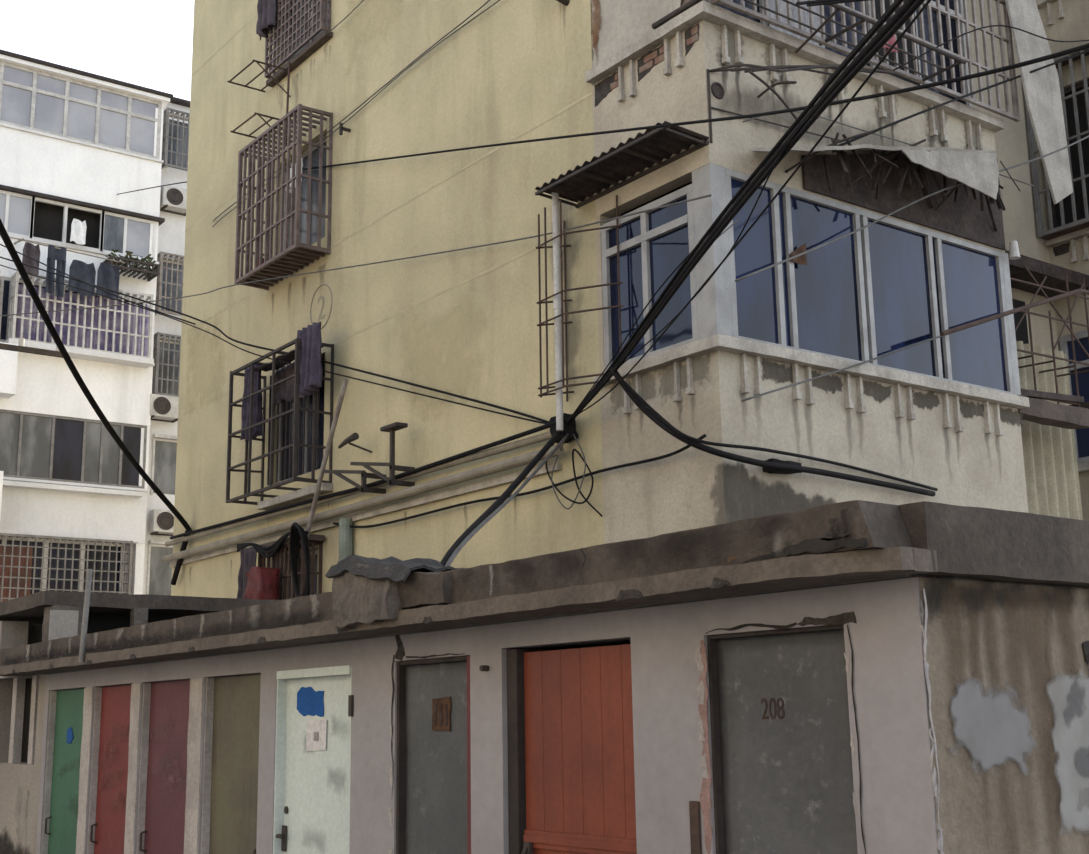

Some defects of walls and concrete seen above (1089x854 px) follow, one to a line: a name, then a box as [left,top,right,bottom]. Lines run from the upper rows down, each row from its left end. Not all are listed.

flaking render [591,0,690,68]
flaking render [685,23,699,56]
flaking render [637,44,664,82]
flaking render [595,71,618,107]
leakage [762,359,793,383]
leakage [811,370,843,394]
leakage [863,381,891,403]
leakage [912,390,940,410]
leakage [959,398,984,418]
spalling [742,510,866,564]
peeling [694,612,866,854]
leakage [0,833,27,854]